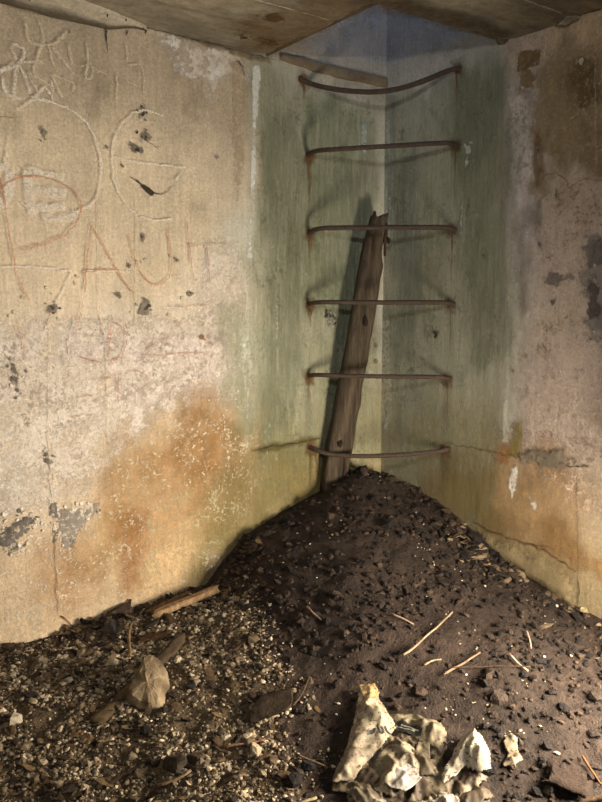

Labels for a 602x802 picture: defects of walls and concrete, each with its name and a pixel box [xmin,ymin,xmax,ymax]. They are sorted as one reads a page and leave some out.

peeling [0,237,256,633]
damp [381,311,393,431]
crack [474,475,580,607]
damp [499,37,602,455]
peeling [512,189,602,515]